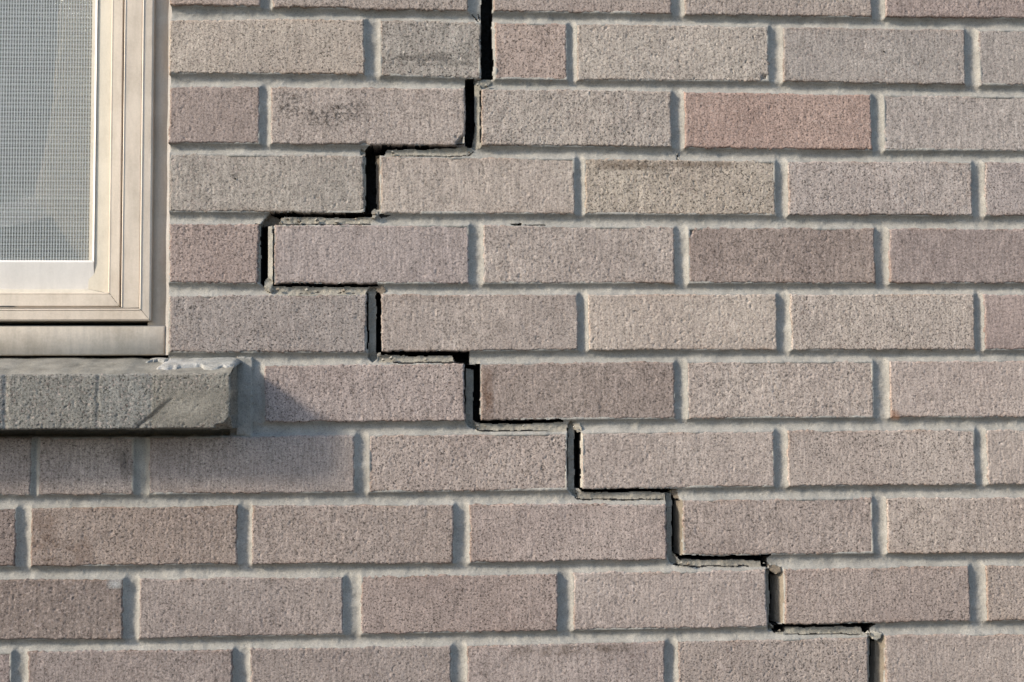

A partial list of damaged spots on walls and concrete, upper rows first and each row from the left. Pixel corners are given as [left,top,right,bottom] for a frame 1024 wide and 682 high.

crack [255,0,885,682]